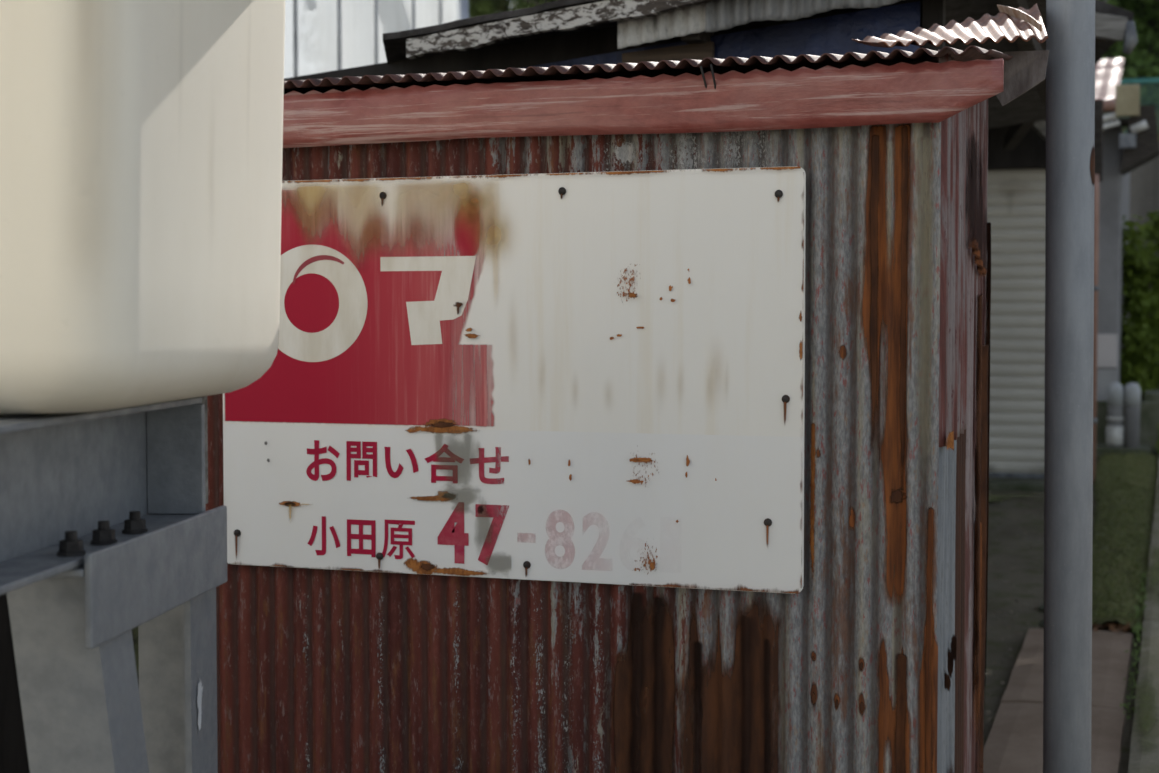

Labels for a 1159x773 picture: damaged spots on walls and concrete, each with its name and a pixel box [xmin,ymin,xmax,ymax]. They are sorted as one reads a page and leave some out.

rust [282,170,671,223]
rust [617,264,637,303]
rust [861,124,911,603]
rust [405,418,477,434]
rust [279,501,310,519]
rust [973,222,991,773]
rust [336,558,487,576]
rust [613,412,821,773]
rust [858,507,957,773]